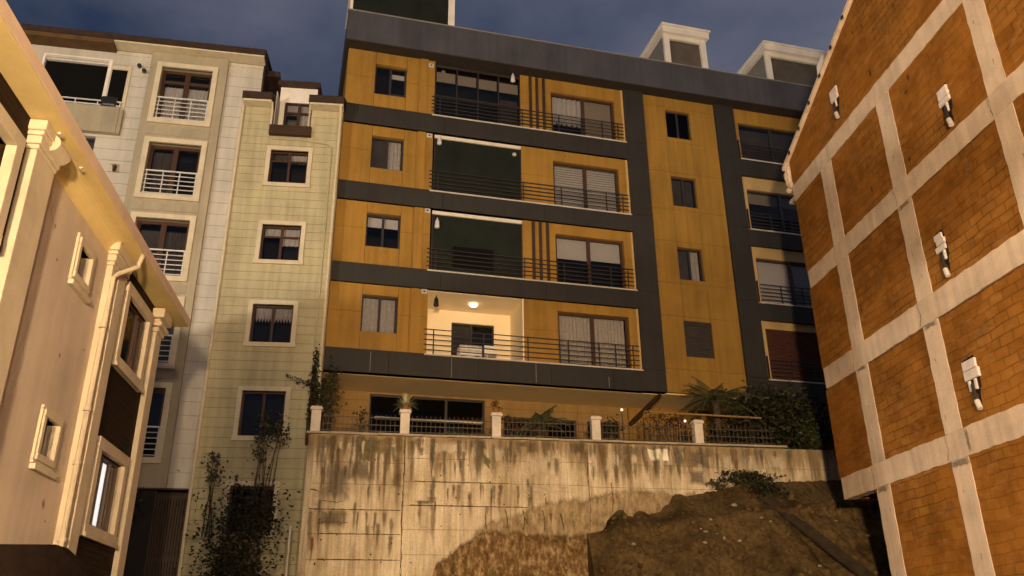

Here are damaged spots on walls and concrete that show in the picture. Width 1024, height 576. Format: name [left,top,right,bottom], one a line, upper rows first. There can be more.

water stain [309,436,563,552]
water stain [571,443,792,483]